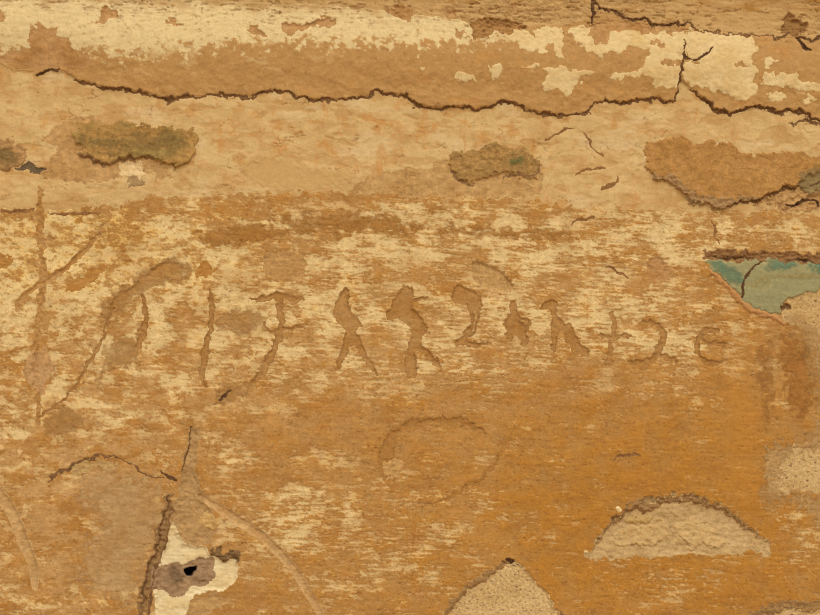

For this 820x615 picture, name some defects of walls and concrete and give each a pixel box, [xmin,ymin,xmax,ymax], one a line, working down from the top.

peeling [0,21,93,72]
peeling [95,5,118,24]
peeling [247,25,267,37]
peeling [281,15,336,36]
peeling [384,4,414,22]
peeling [445,5,820,105]
crack [35,0,820,190]
peeling [195,260,218,279]
crack [48,426,192,615]
spalling [583,491,772,562]
spalling [443,560,509,615]
spalling [748,599,820,615]